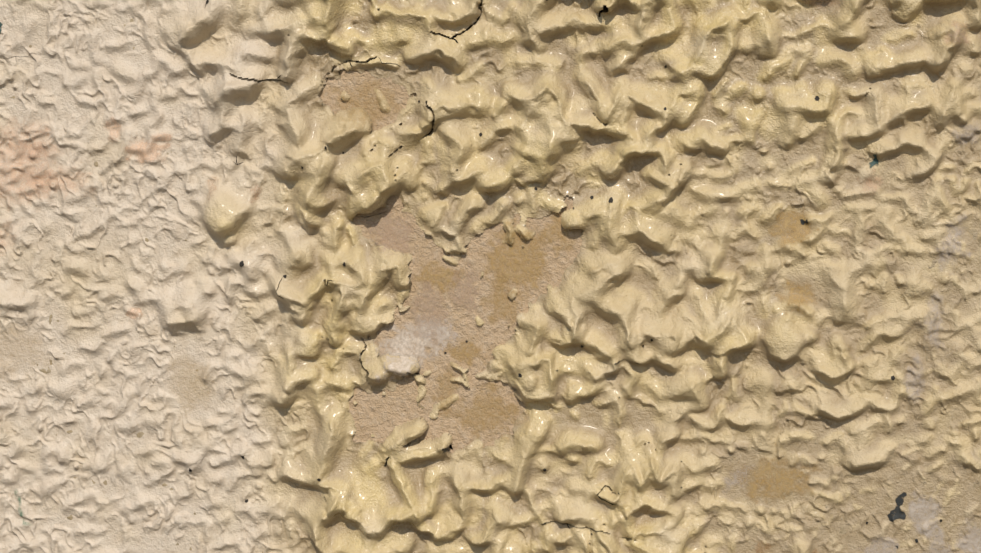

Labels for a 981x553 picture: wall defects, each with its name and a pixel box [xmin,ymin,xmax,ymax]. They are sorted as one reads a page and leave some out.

crack [440,3,482,43]
peeling [319,63,416,138]
peeling [339,195,583,453]
peeling [741,449,981,553]